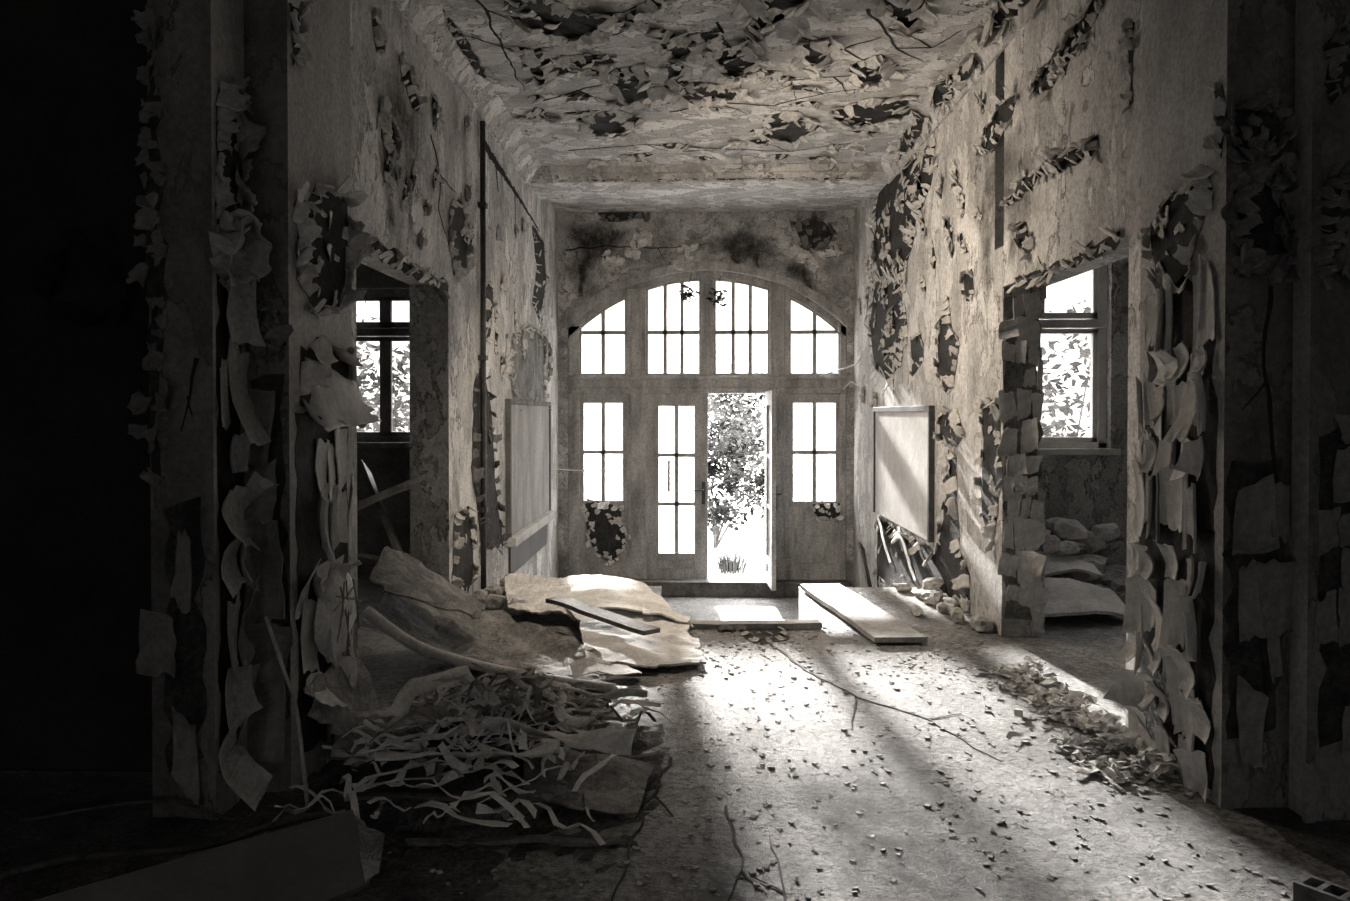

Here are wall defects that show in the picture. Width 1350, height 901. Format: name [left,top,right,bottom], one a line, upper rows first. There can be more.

peeling [288,0,316,69]
peeling [372,6,446,131]
peeling [443,10,498,83]
peeling [1117,18,1135,114]
peeling [126,5,175,490]
peeling [136,73,478,811]
flaking render [451,217,555,596]
spalling [739,626,790,645]
peeling [502,0,1124,632]
peeling [1103,82,1302,802]
peeling [1313,413,1350,755]